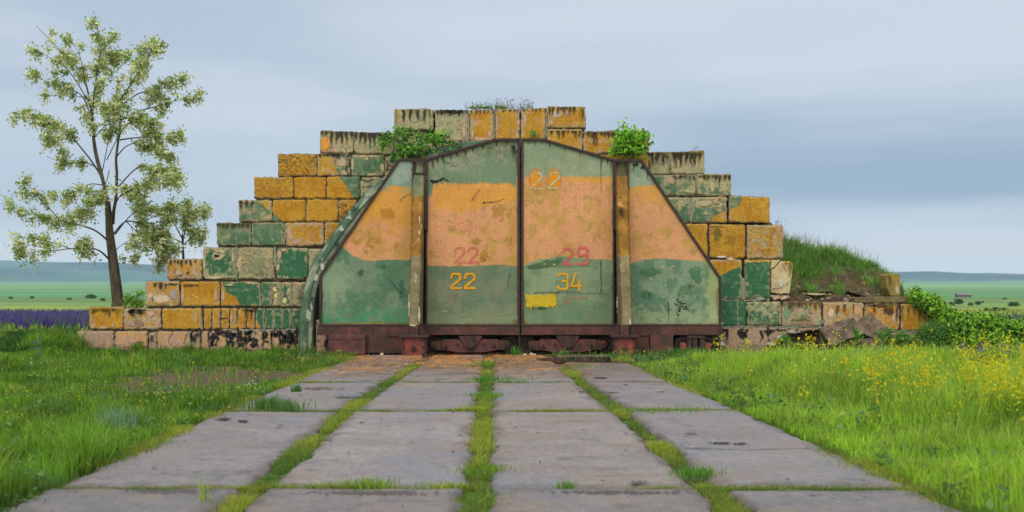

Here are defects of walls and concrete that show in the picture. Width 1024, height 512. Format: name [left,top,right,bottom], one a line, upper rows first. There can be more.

leakage [318,131,391,158]
leakage [394,107,647,150]
leakage [633,151,731,183]
leakage [190,321,306,351]